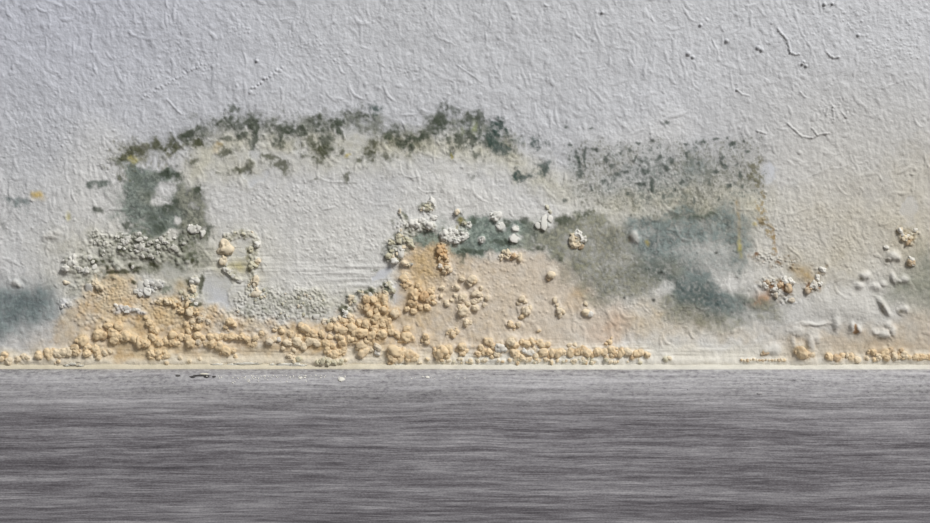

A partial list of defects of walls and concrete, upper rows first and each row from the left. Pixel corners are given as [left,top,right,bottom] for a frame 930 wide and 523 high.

water stain [0,89,930,366]